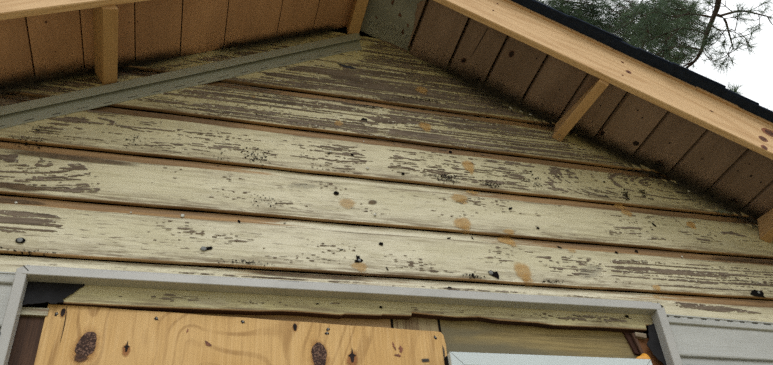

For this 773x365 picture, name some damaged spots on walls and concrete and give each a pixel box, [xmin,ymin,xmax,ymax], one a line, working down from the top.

peeling [0,0,702,205]
peeling [0,210,68,233]
peeling [158,220,253,244]
peeling [609,215,760,244]
rust [516,264,530,280]
peeling [537,254,773,292]